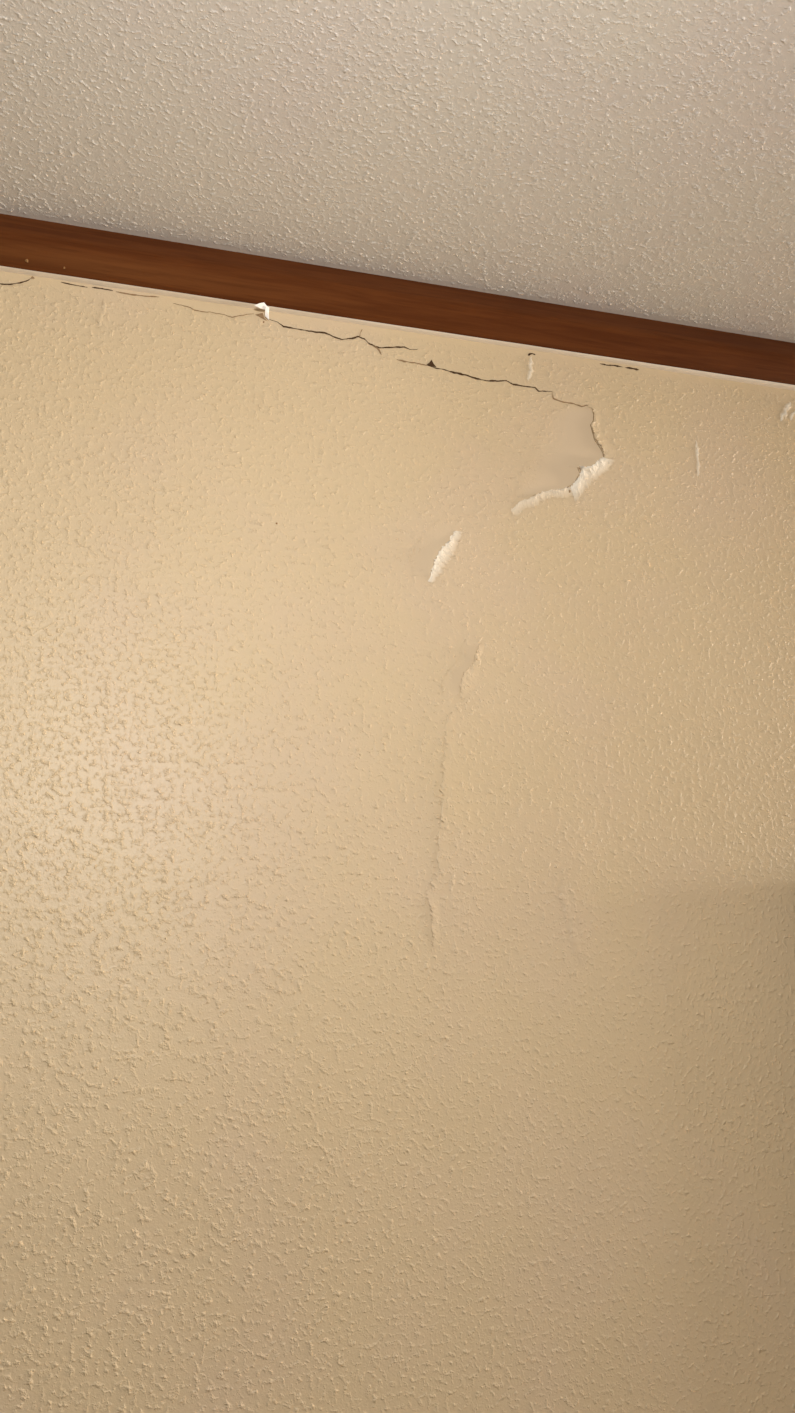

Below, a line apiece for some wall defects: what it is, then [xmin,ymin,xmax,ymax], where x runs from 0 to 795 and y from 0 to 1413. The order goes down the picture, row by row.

crack [173,303,587,407]
peeling [511,403,618,516]